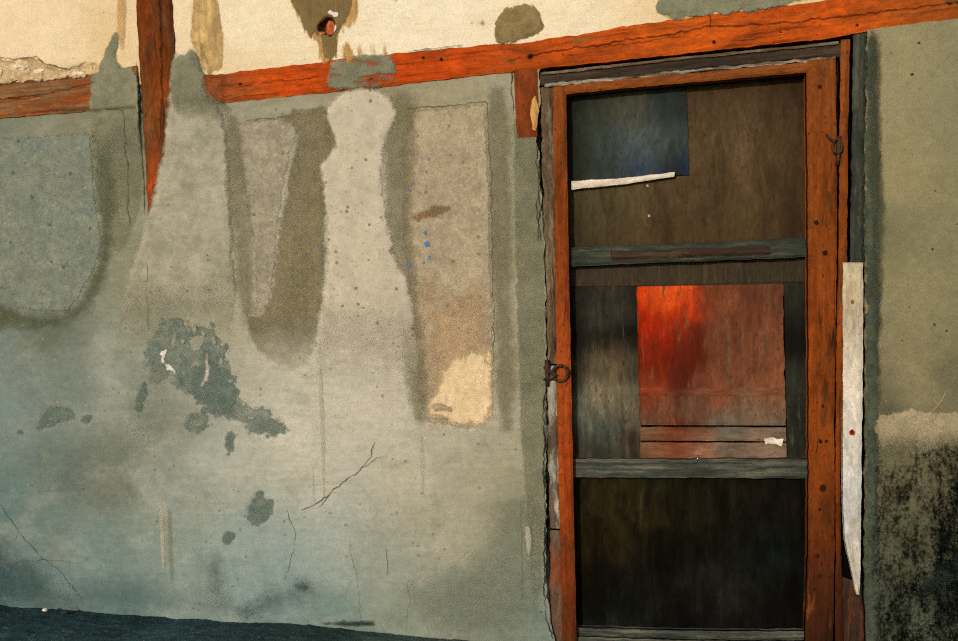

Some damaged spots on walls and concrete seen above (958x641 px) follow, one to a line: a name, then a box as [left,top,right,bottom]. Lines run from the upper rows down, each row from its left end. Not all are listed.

flaking render [0,58,100,84]
damp [71,140,114,316]
damp [227,106,336,342]
damp [0,307,41,327]
flaking render [135,318,289,438]
flaking render [225,432,235,455]
flaking render [247,491,274,526]
crack [284,443,379,580]
damp [873,408,958,641]